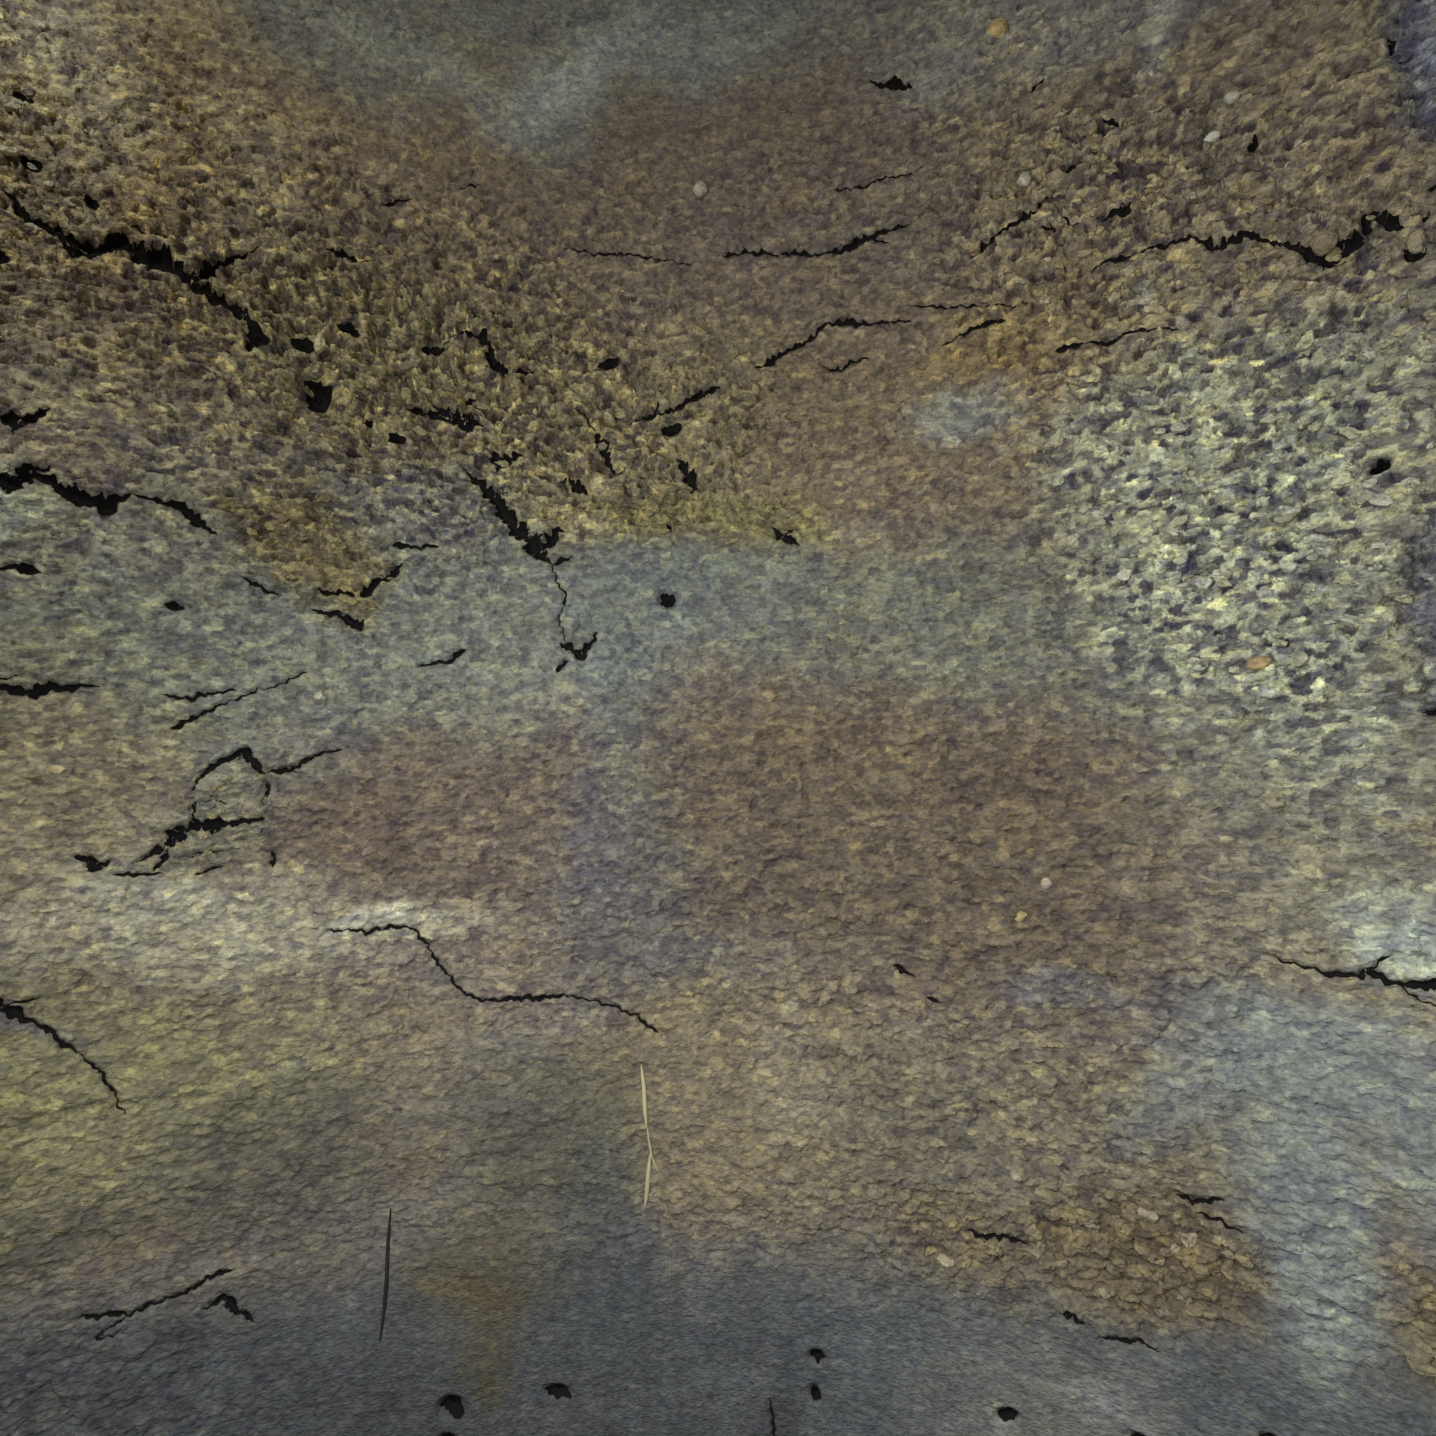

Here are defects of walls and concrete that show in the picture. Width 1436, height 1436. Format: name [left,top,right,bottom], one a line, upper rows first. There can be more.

crack [2,188,262,352]
crack [1092,184,1436,272]
crack [0,407,217,534]
crack [407,328,597,672]
crack [557,386,721,496]
crack [74,747,342,878]
crack [327,924,658,1033]
crack [1269,954,1436,1007]
spalling [545,1384,571,1400]
spalling [811,1385,820,1401]
spalling [810,1349,825,1364]
spalling [998,1407,1018,1422]